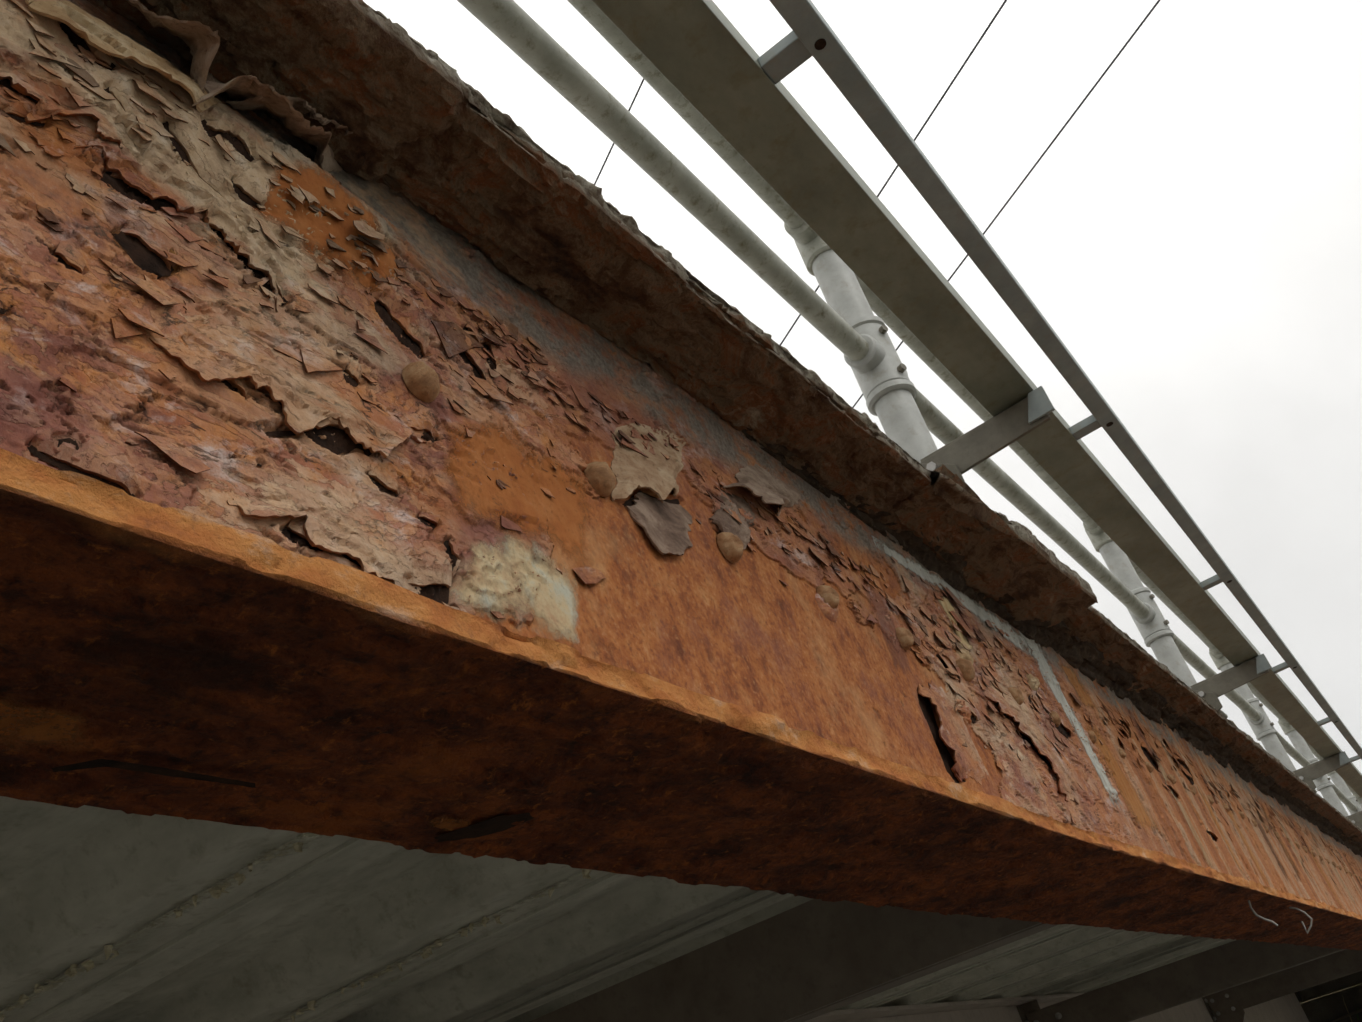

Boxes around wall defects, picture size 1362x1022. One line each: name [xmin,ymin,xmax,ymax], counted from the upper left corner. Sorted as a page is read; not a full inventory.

peeling [0,0,405,312]
peeling [149,286,428,458]
peeling [465,320,490,383]
peeling [227,464,464,605]
peeling [446,424,589,560]
peeling [610,423,693,556]
peeling [709,464,802,550]
rust [0,699,82,749]
peeling [936,645,1096,803]
rust [721,418,1362,907]